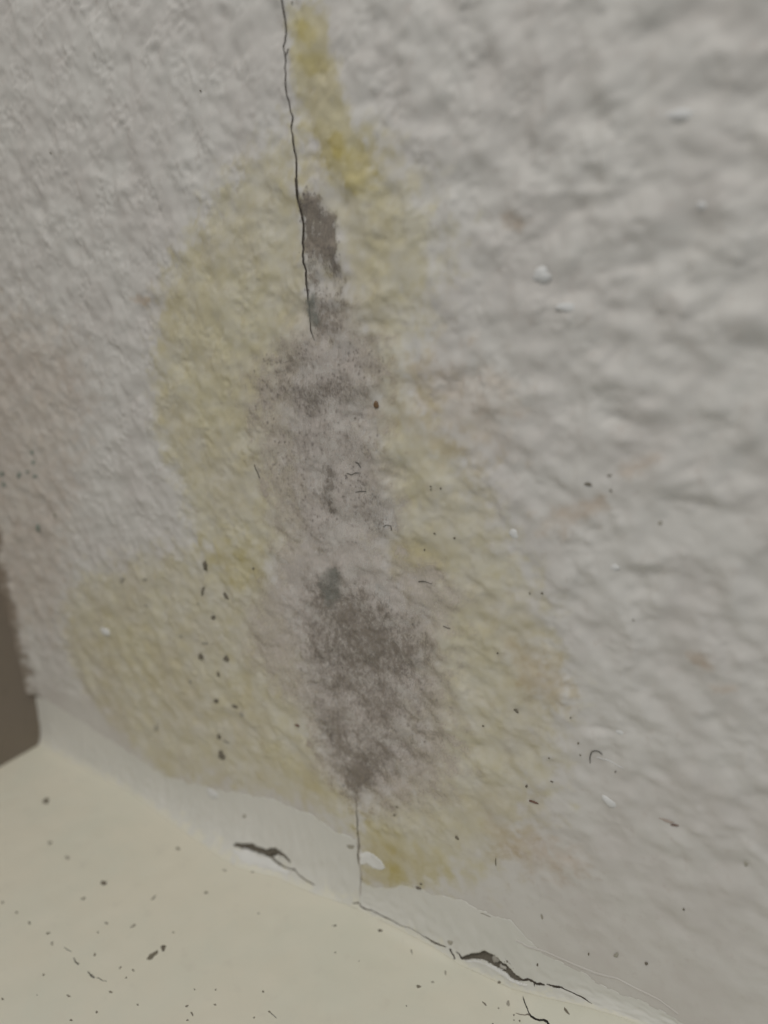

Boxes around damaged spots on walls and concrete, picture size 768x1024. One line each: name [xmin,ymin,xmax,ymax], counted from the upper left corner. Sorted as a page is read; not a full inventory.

crack [281,0,315,341]
leakage [252,185,460,810]
crack [353,798,463,960]
crack [516,978,592,1024]